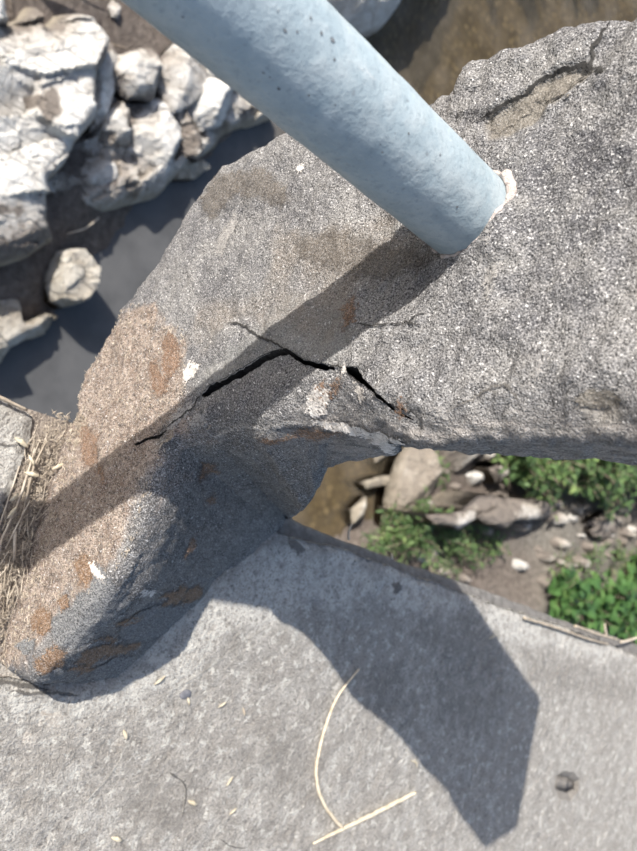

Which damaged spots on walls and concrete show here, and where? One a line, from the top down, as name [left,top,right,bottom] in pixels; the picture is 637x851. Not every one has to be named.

crack [475,19,612,121]
crack [135,322,420,445]
corrosion [30,594,97,677]